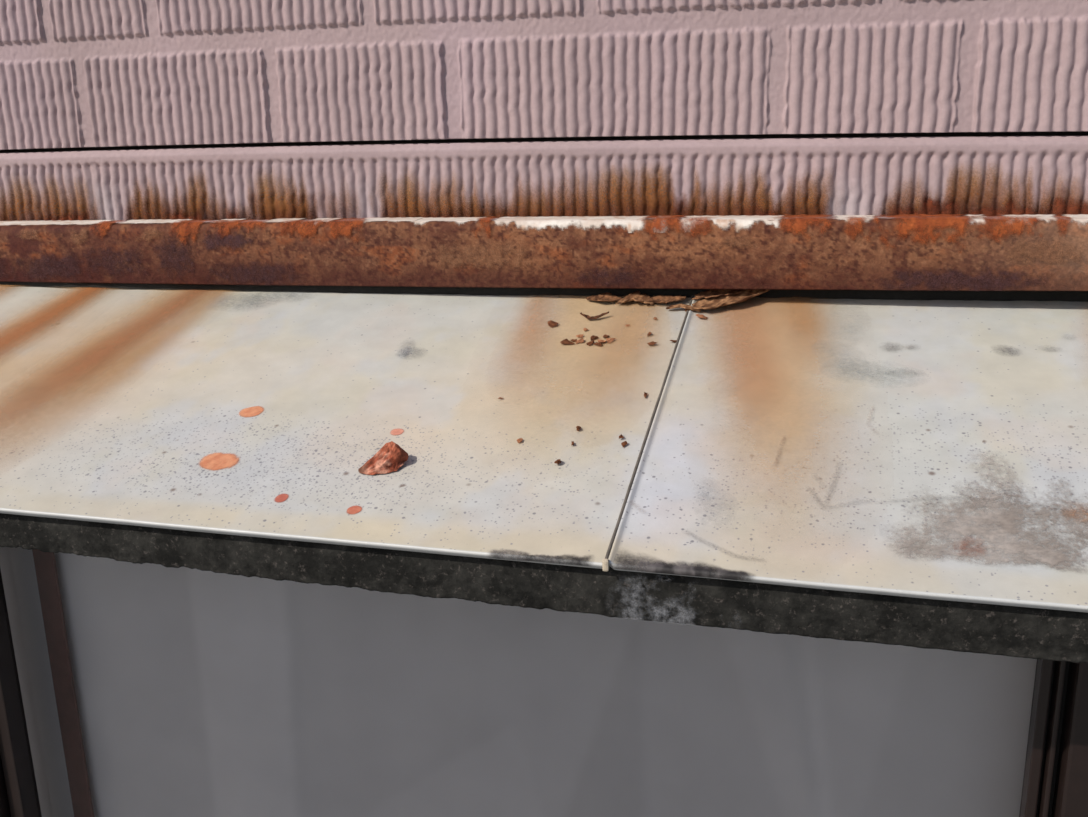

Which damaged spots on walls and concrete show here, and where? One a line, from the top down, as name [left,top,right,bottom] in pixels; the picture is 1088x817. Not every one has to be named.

corrosion [0,175,1088,464]
corrosion [200,453,239,470]
corrosion [358,429,409,475]